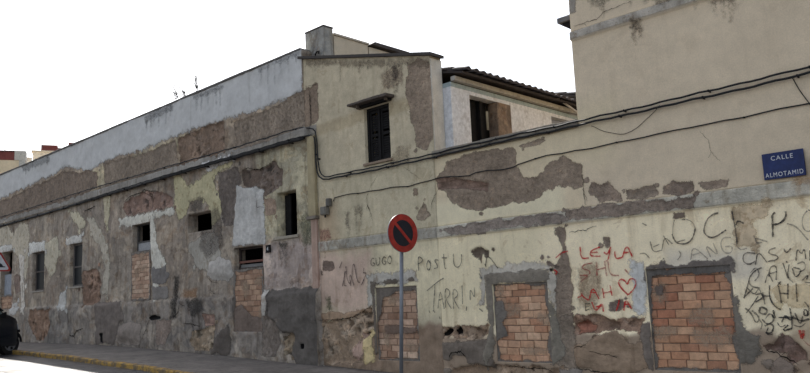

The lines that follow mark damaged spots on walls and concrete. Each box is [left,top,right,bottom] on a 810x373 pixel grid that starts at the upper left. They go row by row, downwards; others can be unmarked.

spalling [405,57,433,152]
spalling [0,83,319,316]
spalling [435,137,728,319]
peeling [352,329,375,365]